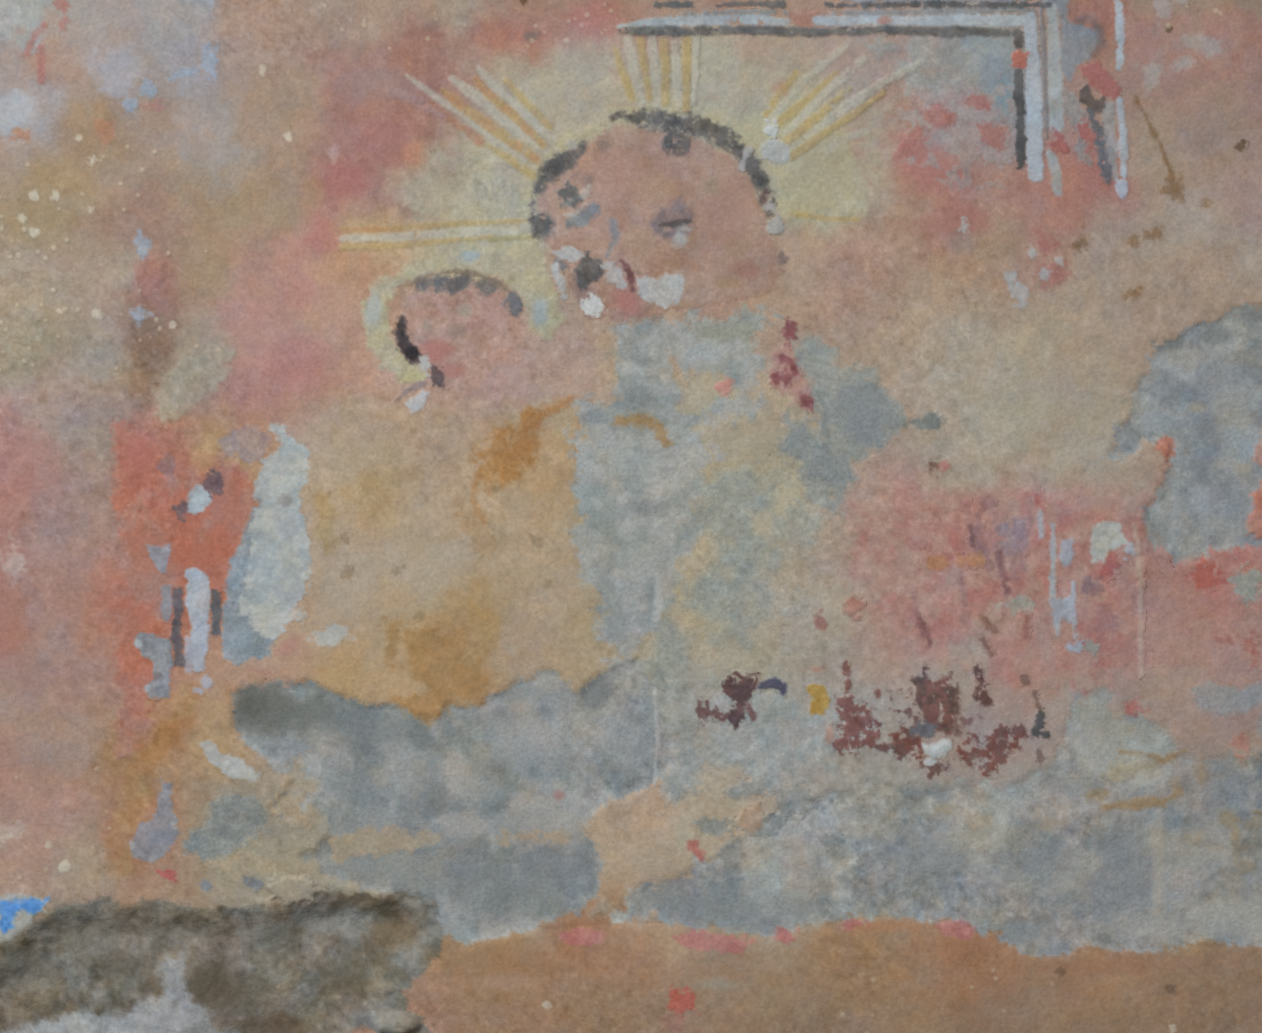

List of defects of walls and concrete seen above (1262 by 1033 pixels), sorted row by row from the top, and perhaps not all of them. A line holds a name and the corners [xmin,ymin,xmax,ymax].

peeling [669,221,696,250]
peeling [1002,230,1086,311]
peeling [0,244,1262,1033]